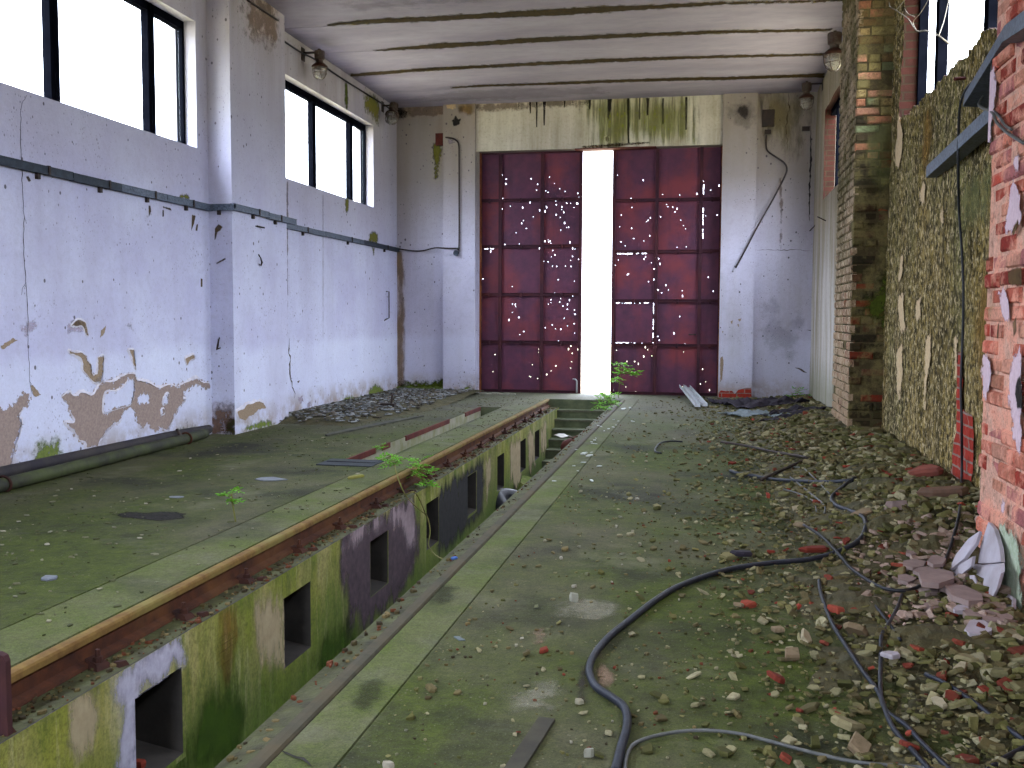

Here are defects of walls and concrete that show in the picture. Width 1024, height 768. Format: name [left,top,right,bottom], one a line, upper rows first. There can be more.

damp [476,100,591,127]
damp [627,98,649,143]
peeling [70,318,106,337]
peeling [0,385,41,467]
peeling [61,348,210,449]
crack [288,339,303,400]
damp [510,424,547,488]
spalling [0,399,635,768]
damp [255,600,285,666]
damp [70,693,97,756]
damp [115,638,185,768]